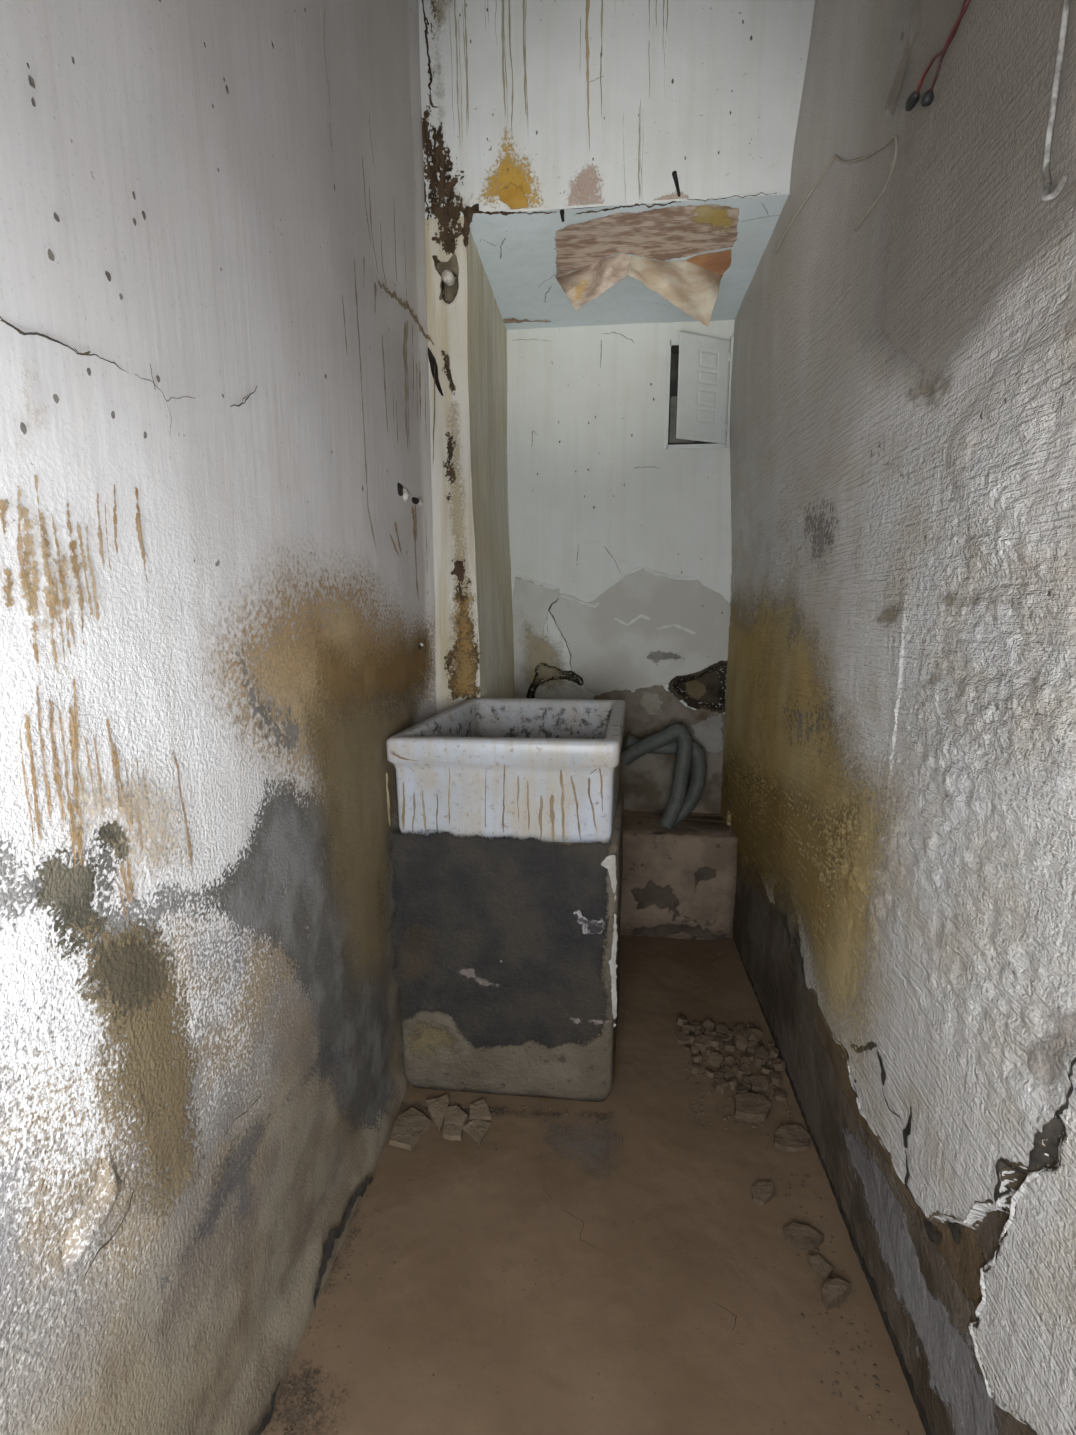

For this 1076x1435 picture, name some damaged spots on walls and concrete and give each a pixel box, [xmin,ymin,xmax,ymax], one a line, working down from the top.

crack [0,316,193,429]
crack [230,386,257,407]
rust [0,475,118,673]
rust [135,488,149,591]
leakage [804,499,838,569]
peeling [512,539,731,812]
rust [20,679,193,920]
leakage [720,595,887,1039]
leakage [36,820,269,1265]
flaking render [733,852,1066,1435]
crack [994,1057,1076,1212]